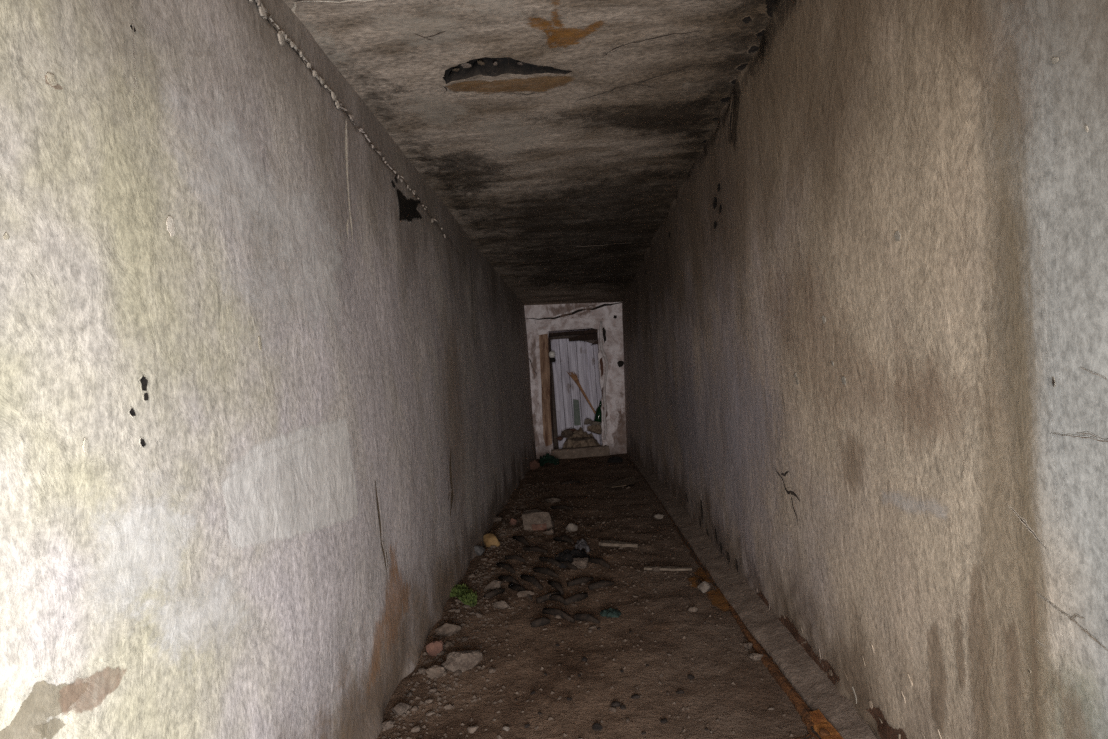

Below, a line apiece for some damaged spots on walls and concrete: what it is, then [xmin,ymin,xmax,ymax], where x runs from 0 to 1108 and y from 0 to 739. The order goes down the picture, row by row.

rust [531,2,601,48]
hole [429,50,585,88]
flaking render [249,0,446,238]
crack [1080,367,1108,381]
crack [1051,432,1108,443]
rust [689,568,843,739]